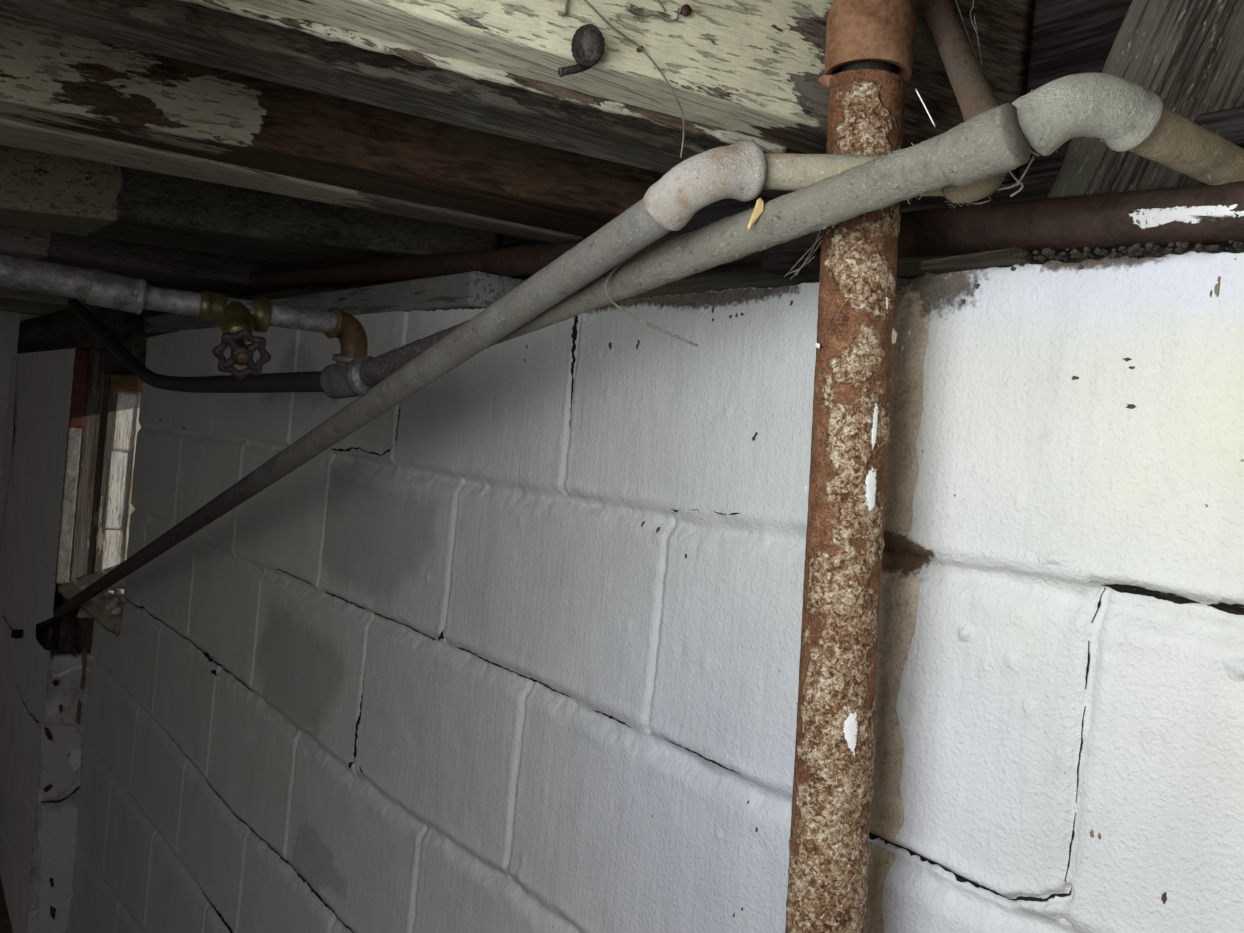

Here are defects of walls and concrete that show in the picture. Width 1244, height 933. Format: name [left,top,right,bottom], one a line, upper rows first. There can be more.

crack [332,403,400,457]
crack [569,316,579,433]
crack [125,598,253,691]
crack [277,569,631,728]
crack [349,681,366,778]
crack [666,739,739,774]
crack [869,584,1244,902]
crack [167,733,353,933]